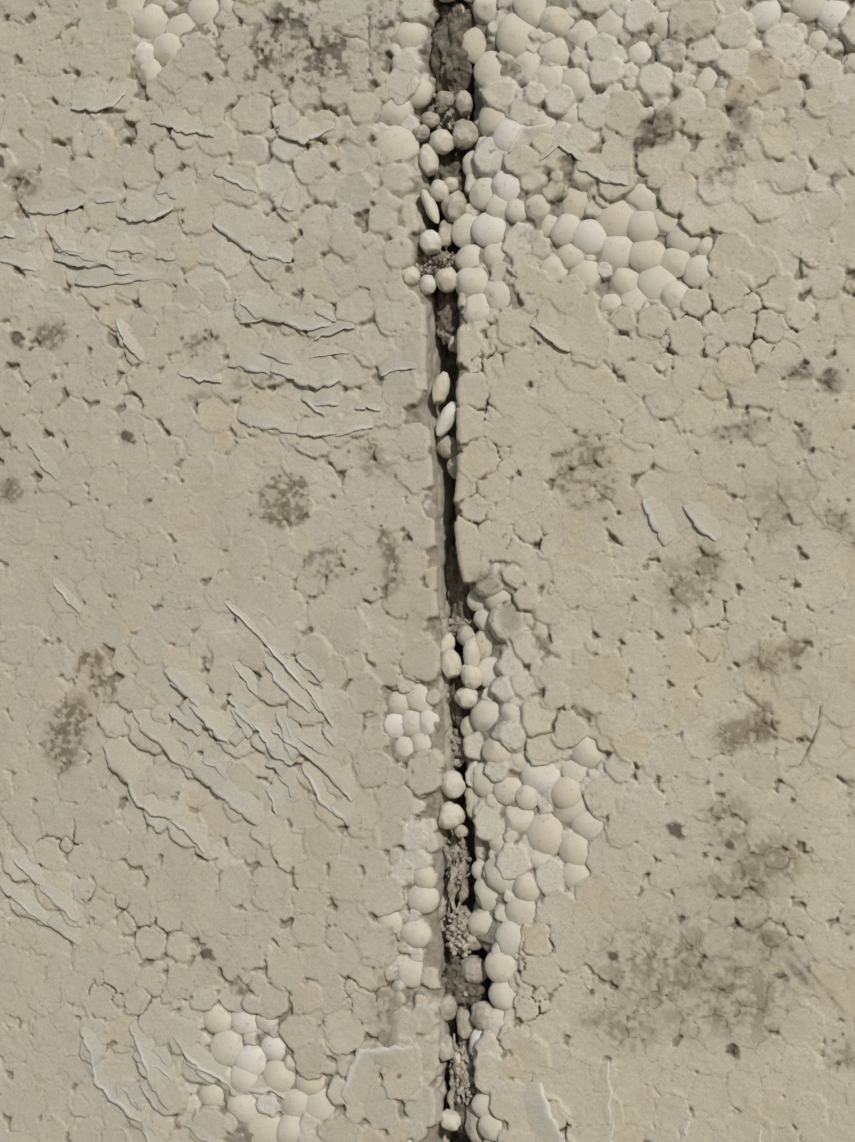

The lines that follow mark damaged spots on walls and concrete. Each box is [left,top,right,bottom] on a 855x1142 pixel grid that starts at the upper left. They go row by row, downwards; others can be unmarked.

peeling [71,82,127,112]
peeling [278,116,335,145]
spalling [695,67,718,92]
spalling [744,0,850,62]
peeling [28,180,177,287]
peeling [177,291,381,437]
crack [688,280,797,361]
peeling [132,600,359,826]
peeling [103,736,209,854]
peeling [0,854,82,946]
spalling [378,866,440,988]
spalling [79,1005,423,1142]